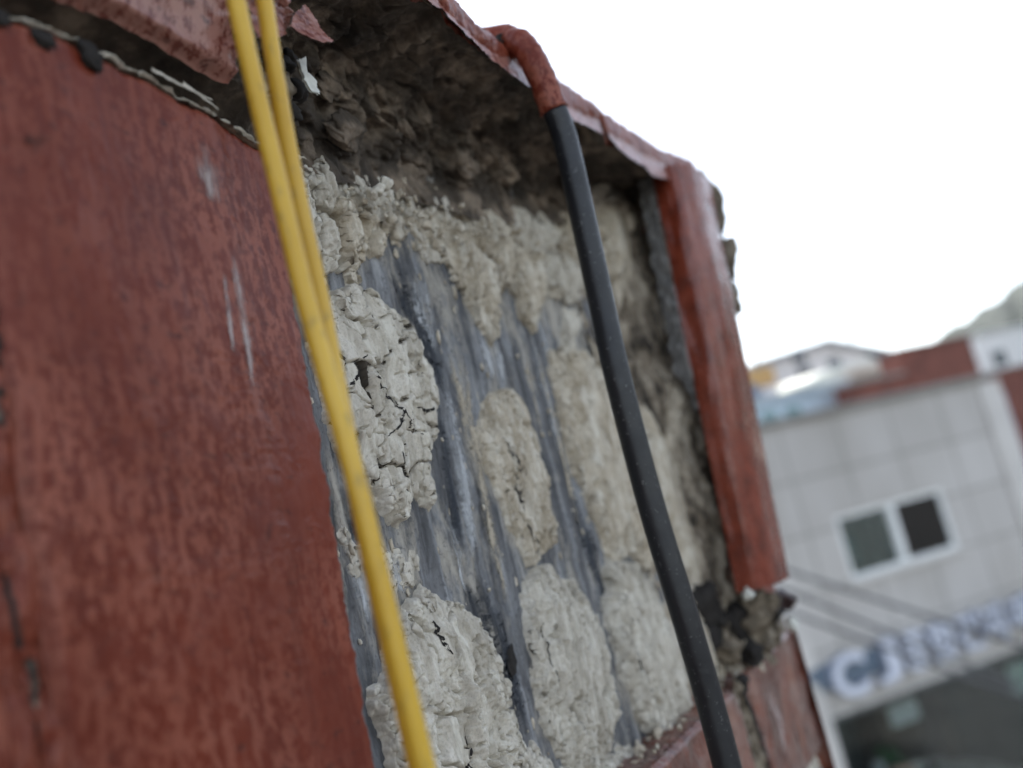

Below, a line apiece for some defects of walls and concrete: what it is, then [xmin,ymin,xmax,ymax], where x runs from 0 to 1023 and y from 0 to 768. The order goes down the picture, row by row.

peeling [248,6,272,108]
peeling [274,0,365,154]
peeling [423,0,532,89]
peeling [568,107,673,180]
crack [341,323,438,491]
spalling [692,580,798,672]